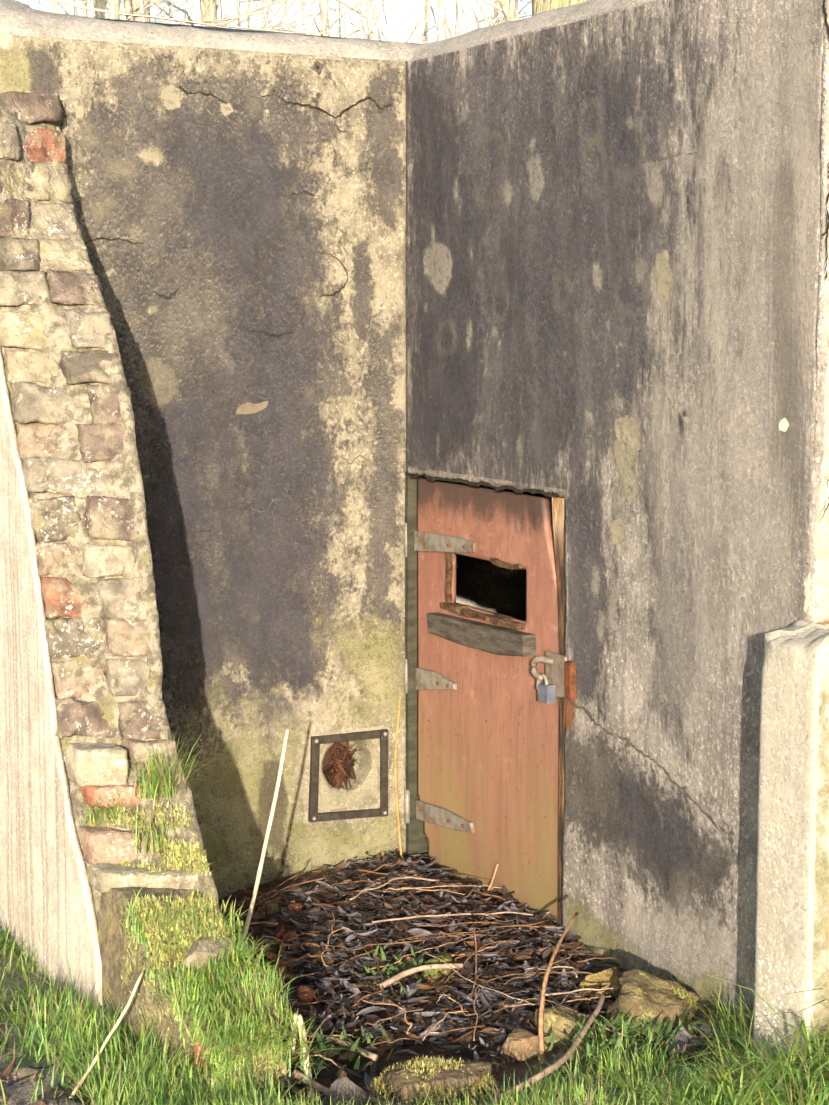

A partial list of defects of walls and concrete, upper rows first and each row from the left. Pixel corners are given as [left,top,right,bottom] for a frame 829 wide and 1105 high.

crack [821,0,829,37]
crack [177,86,227,129]
crack [253,76,393,132]
damp [781,22,819,313]
crack [821,163,829,282]
damp [60,0,730,768]
damp [779,418,789,432]
spalling [803,334,829,623]
damp [259,760,288,877]
crack [572,702,721,833]
damp [562,717,739,960]